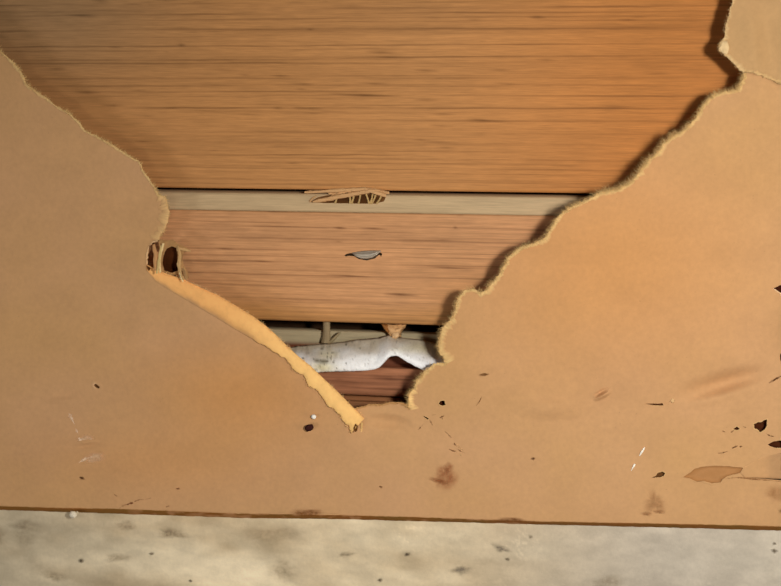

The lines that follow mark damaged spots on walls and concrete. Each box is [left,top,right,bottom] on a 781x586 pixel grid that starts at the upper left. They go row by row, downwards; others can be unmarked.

spalling [311,194,385,204]
peeling [681,464,745,486]